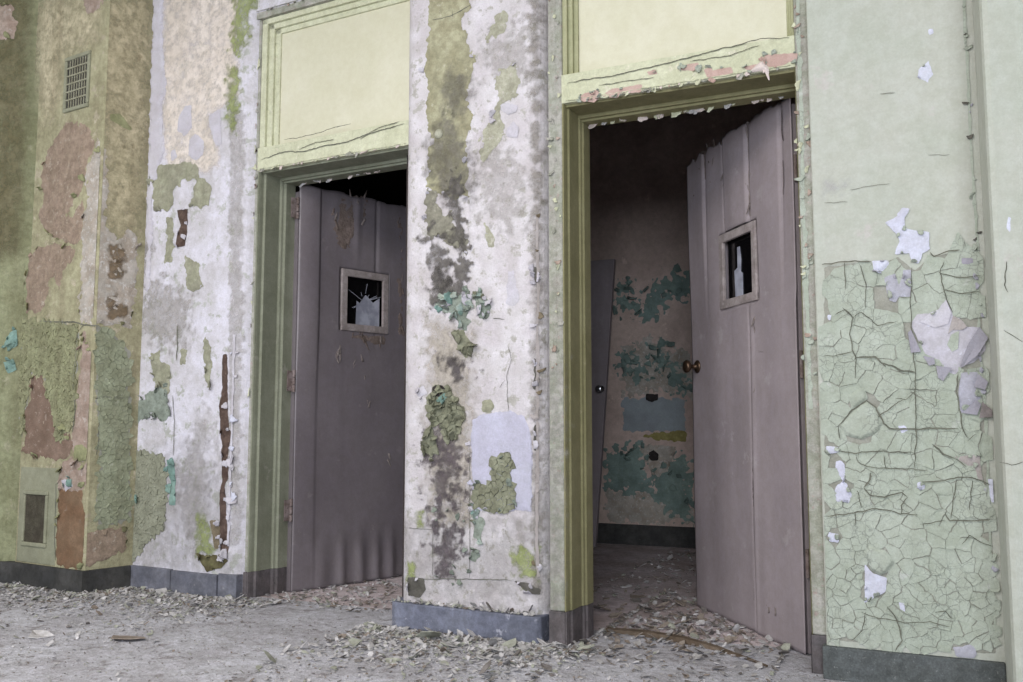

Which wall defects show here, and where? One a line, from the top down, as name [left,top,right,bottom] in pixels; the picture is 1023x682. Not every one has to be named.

peeling [0,0,212,567]
damp [416,121,473,314]
damp [422,323,475,586]
peeling [415,0,818,595]
flaking render [872,208,930,302]
crack [818,233,1022,655]
flaking render [917,61,933,82]
flaking render [908,300,992,434]
peeling [962,0,982,291]